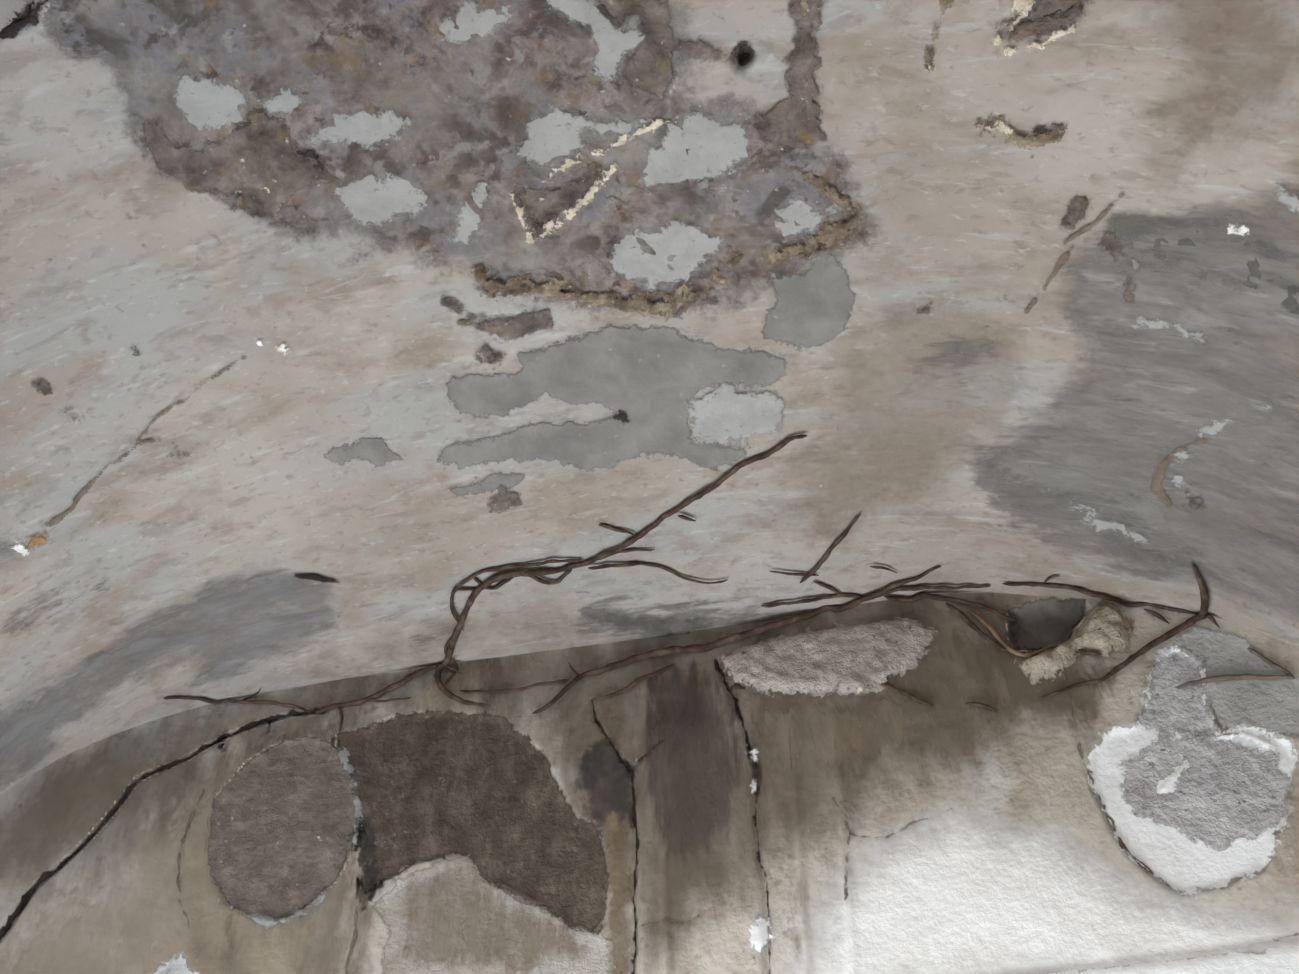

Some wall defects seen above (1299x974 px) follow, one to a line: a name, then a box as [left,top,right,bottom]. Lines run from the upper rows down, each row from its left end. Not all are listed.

spalling [993,0,1088,56]
flaking render [0,0,872,514]
peeling [986,184,1299,616]
leakage [974,458,1182,581]
crack [0,708,325,940]
flaking render [207,709,609,935]
crack [591,700,699,974]
leakage [646,673,739,859]
peeling [719,616,938,699]
leakage [763,639,1020,775]
spalling [1014,601,1134,685]
flaking render [1086,645,1299,895]